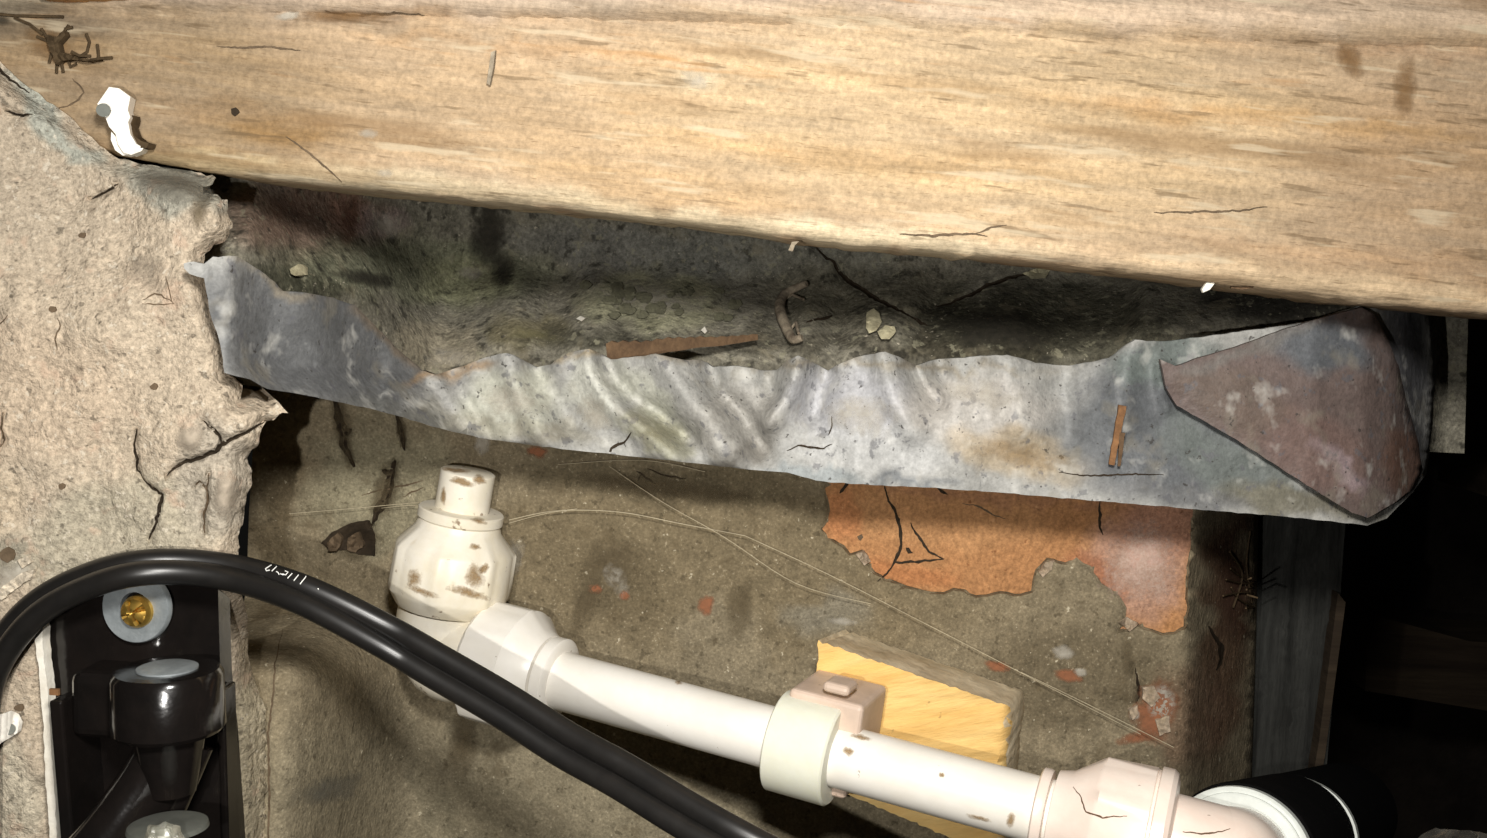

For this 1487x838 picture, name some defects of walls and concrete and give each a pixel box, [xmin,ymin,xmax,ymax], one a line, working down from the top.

crack [133,421,265,539]
flaking render [822,482,1193,633]